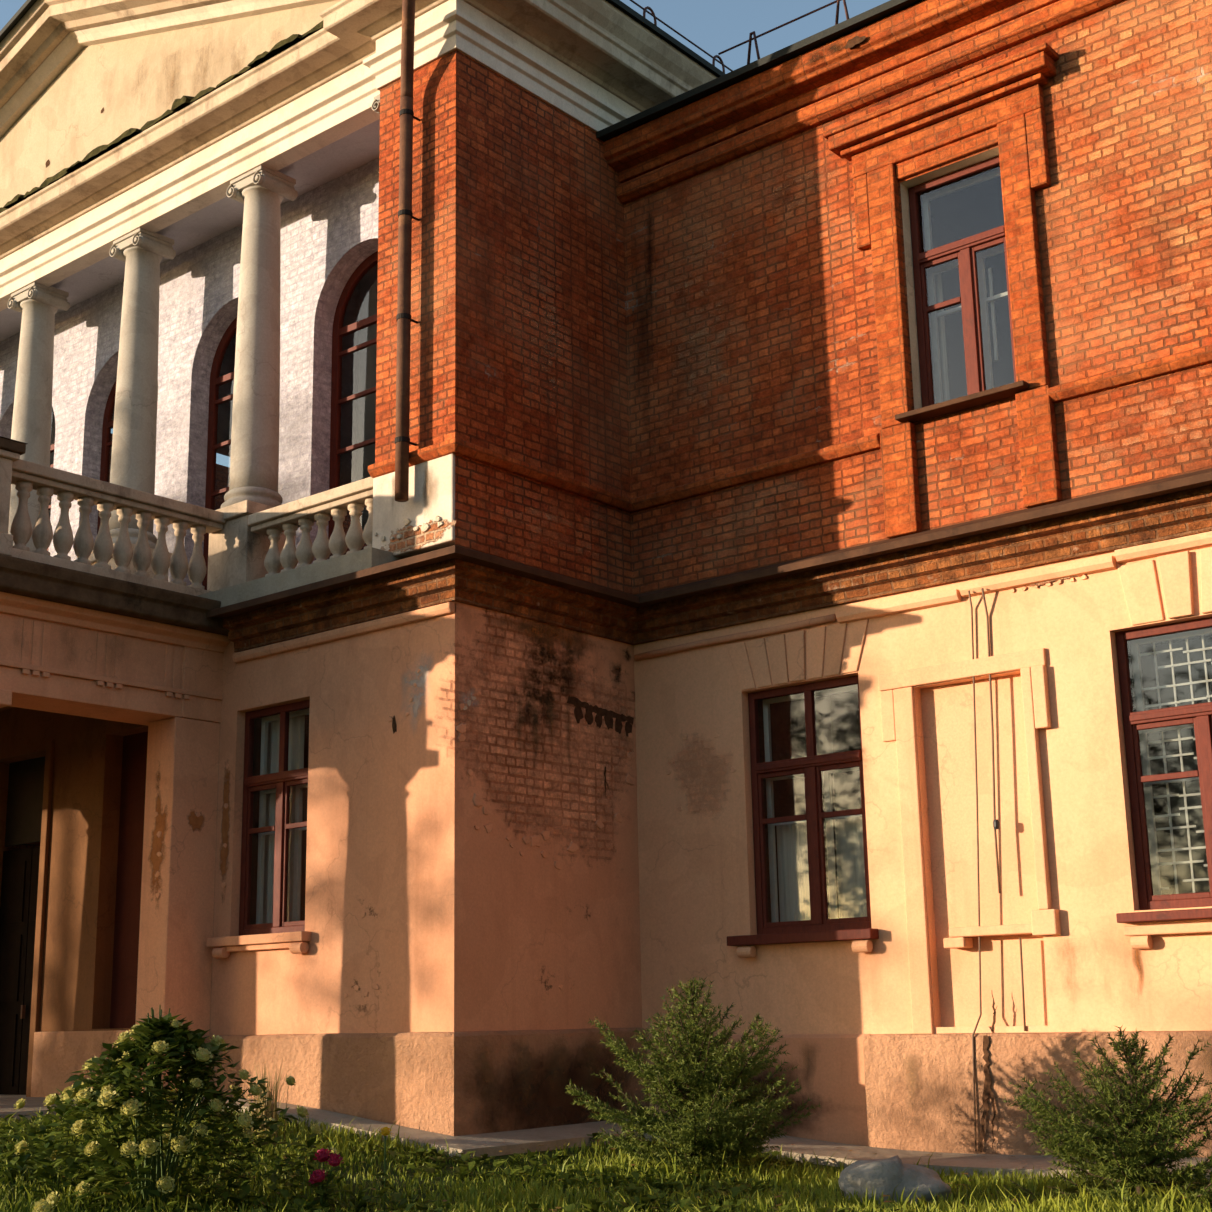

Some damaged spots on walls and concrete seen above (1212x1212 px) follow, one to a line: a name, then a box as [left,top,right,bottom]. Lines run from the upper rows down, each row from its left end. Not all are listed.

spalling [374,516,456,553]
peeling [388,667,427,733]
spalling [439,609,636,870]
peeling [149,774,166,898]
peeling [220,764,230,898]